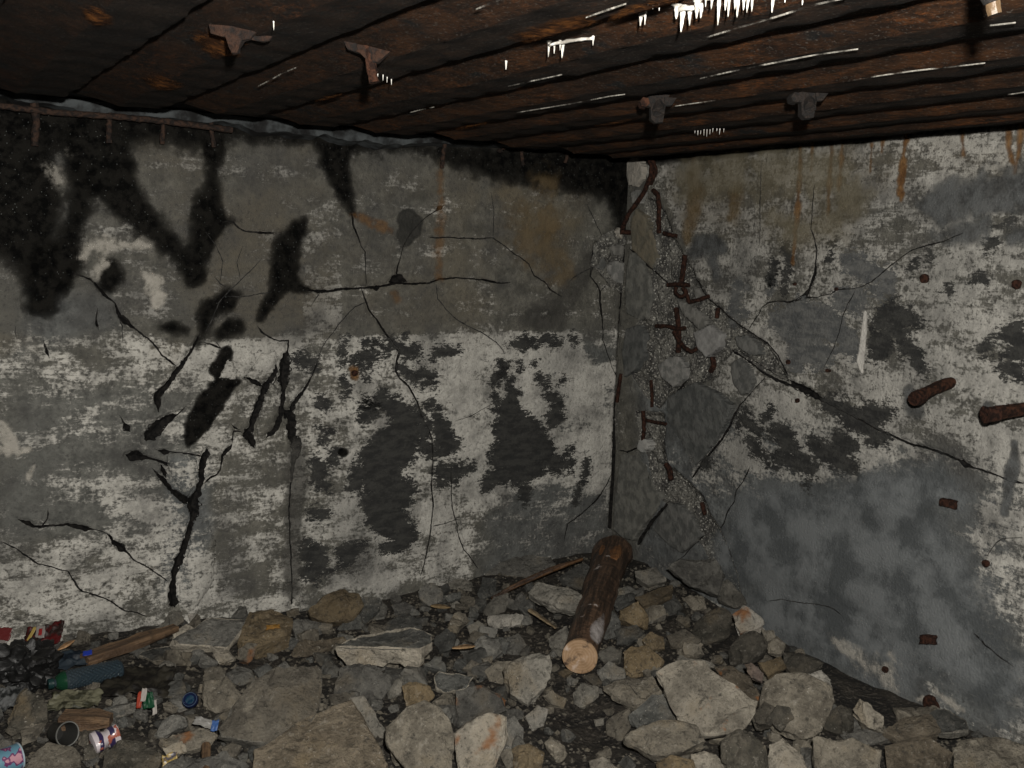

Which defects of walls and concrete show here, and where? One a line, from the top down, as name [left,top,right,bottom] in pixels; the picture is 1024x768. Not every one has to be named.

water stain [23,121,151,317]
water stain [161,299,245,345]
water stain [185,146,234,278]
crack [1,192,637,617]
spalling [590,156,939,593]
crack [692,185,1023,484]
corrosion [897,134,909,201]
corrosion [908,377,956,406]
peeling [938,211,1019,302]
corrosion [979,402,1024,423]
crack [637,501,669,545]
water stain [714,467,1024,720]